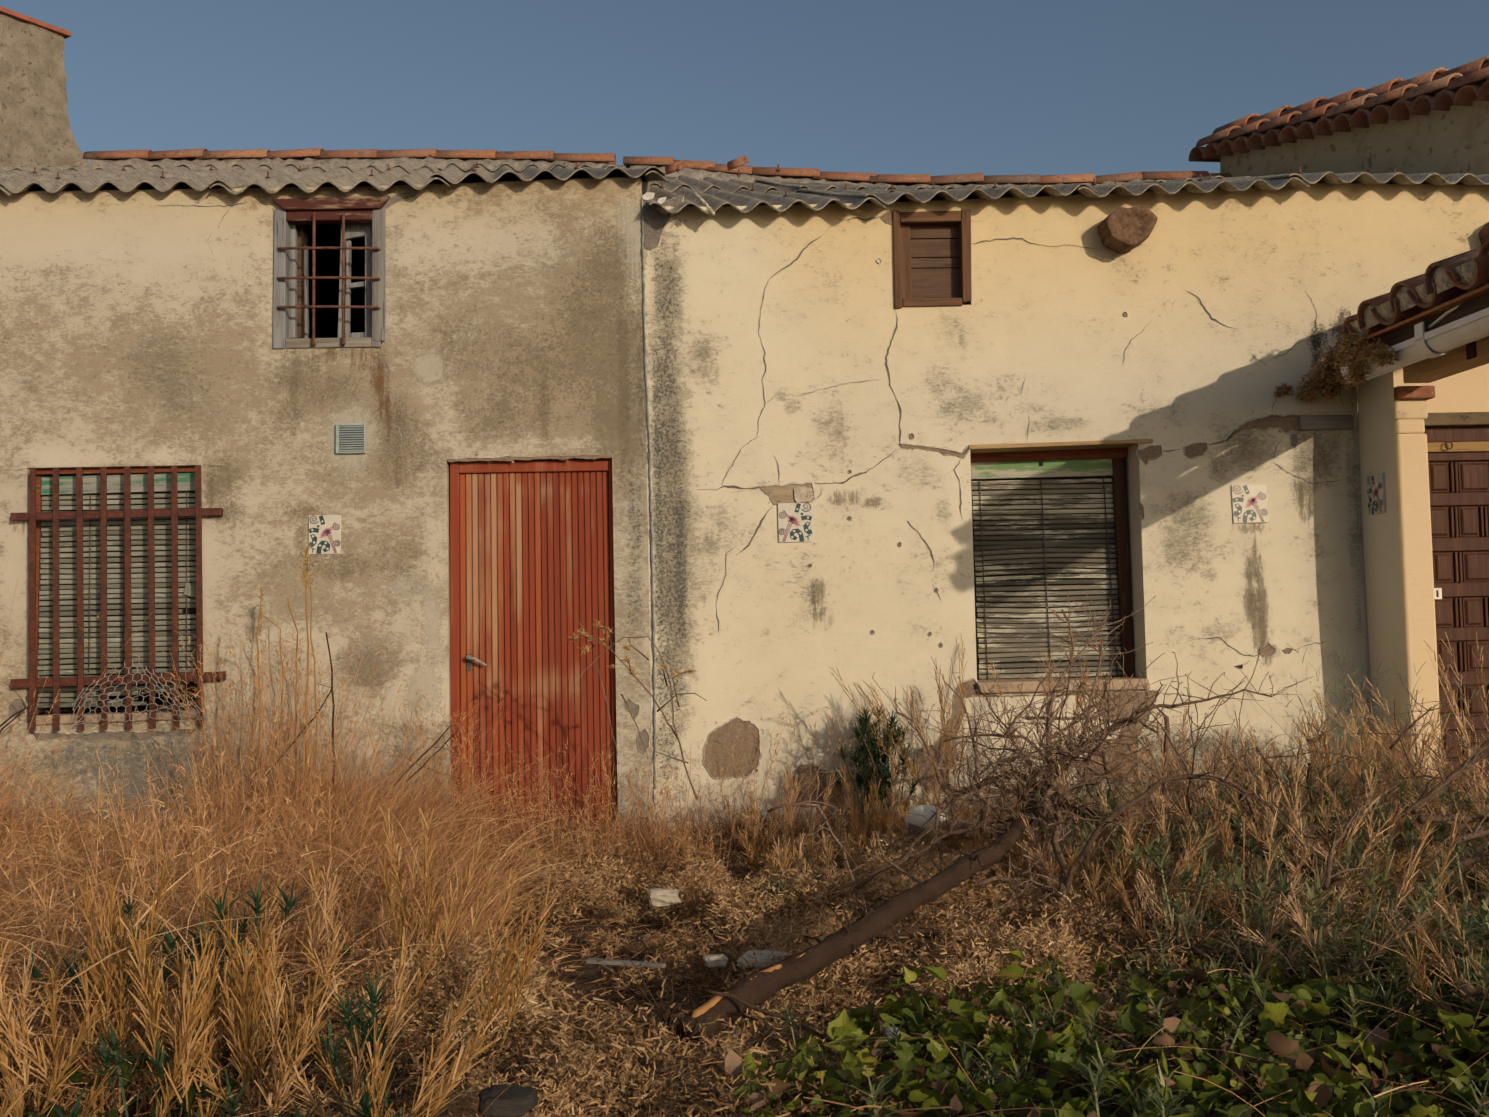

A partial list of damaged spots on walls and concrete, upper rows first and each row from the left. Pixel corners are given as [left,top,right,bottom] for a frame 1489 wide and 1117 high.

crack [972,220,1102,249]
crack [698,217,902,629]
flaking render [1136,413,1302,465]
crack [1123,291,1362,583]
leakage [627,257,690,779]
flaking render [759,481,816,505]
crack [949,448,969,521]
crack [907,521,941,600]
flaking render [702,716,764,780]